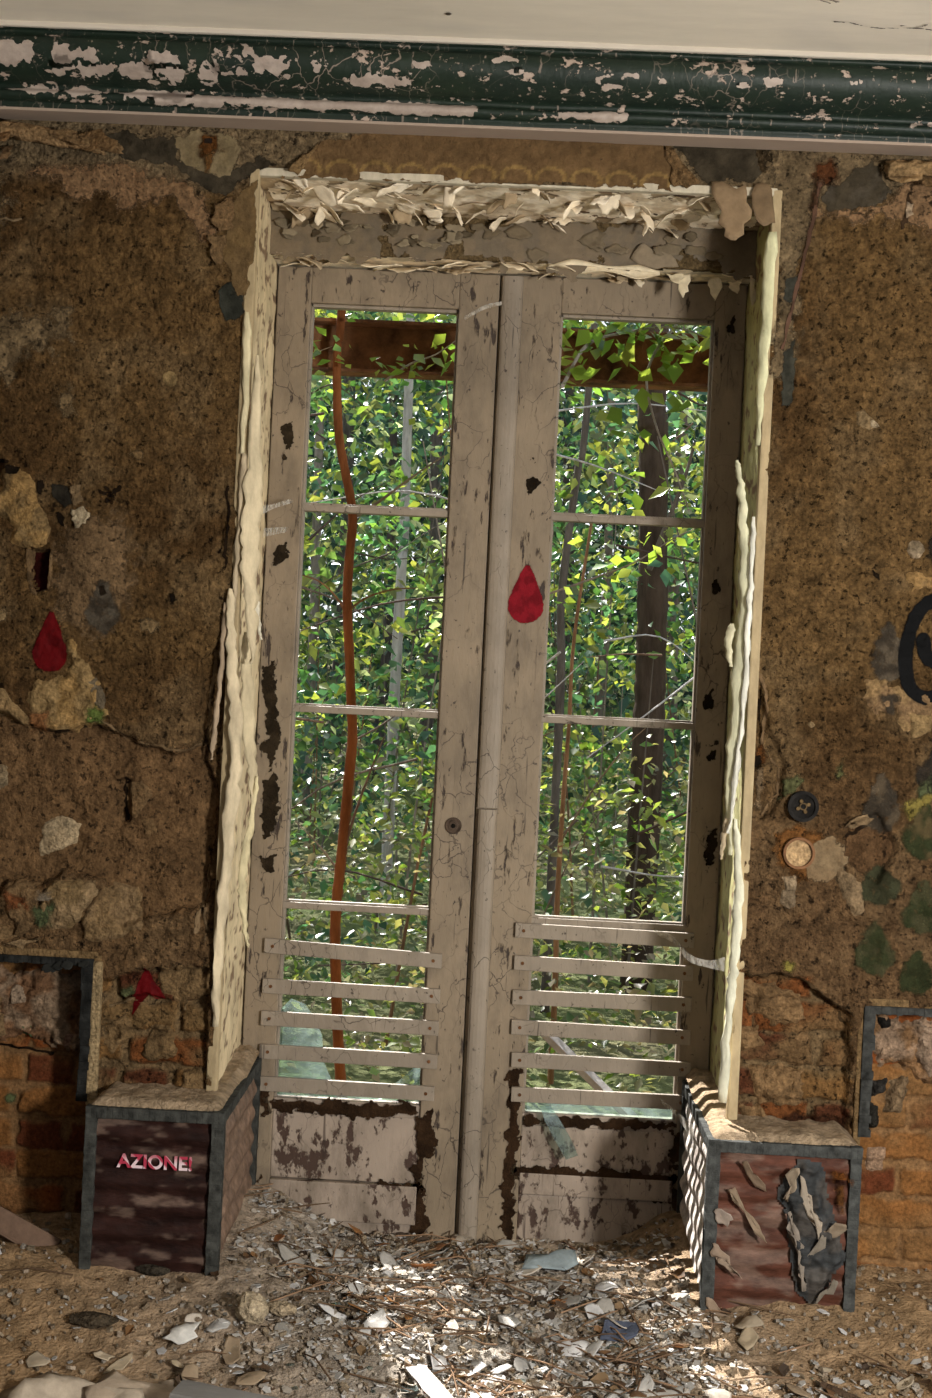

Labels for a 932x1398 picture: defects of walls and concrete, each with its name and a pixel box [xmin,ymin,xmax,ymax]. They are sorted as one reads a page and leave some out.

crack [820,0,932,31]
peeling [0,39,478,117]
peeling [492,55,524,76]
peeling [595,73,639,92]
peeling [734,77,783,89]
peeling [556,111,629,123]
peeling [26,129,932,446]
spalling [906,540,932,592]
spalling [0,281,263,1093]
spalling [863,678,932,739]
flaking render [718,460,855,1128]
spalling [779,814,896,916]